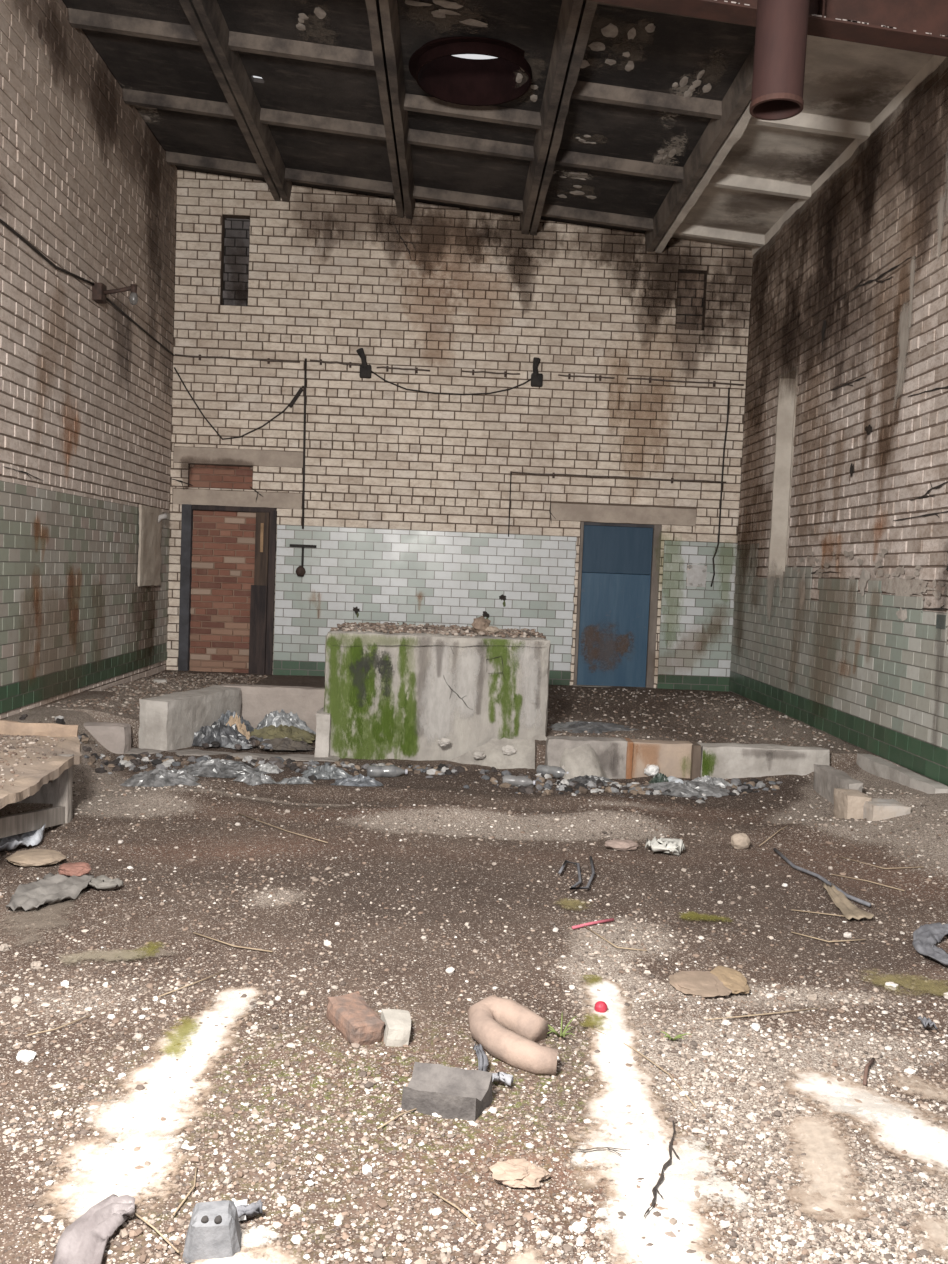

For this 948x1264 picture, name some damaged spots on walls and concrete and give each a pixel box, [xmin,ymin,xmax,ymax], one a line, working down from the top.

peeling [296,0,337,45]
peeling [397,0,488,35]
peeling [580,8,656,71]
peeling [670,49,728,98]
damp [937,161,948,258]
damp [894,258,915,407]
damp [347,637,498,757]
damp [512,642,541,736]
crack [568,1147,631,1155]
crack [644,1121,679,1217]